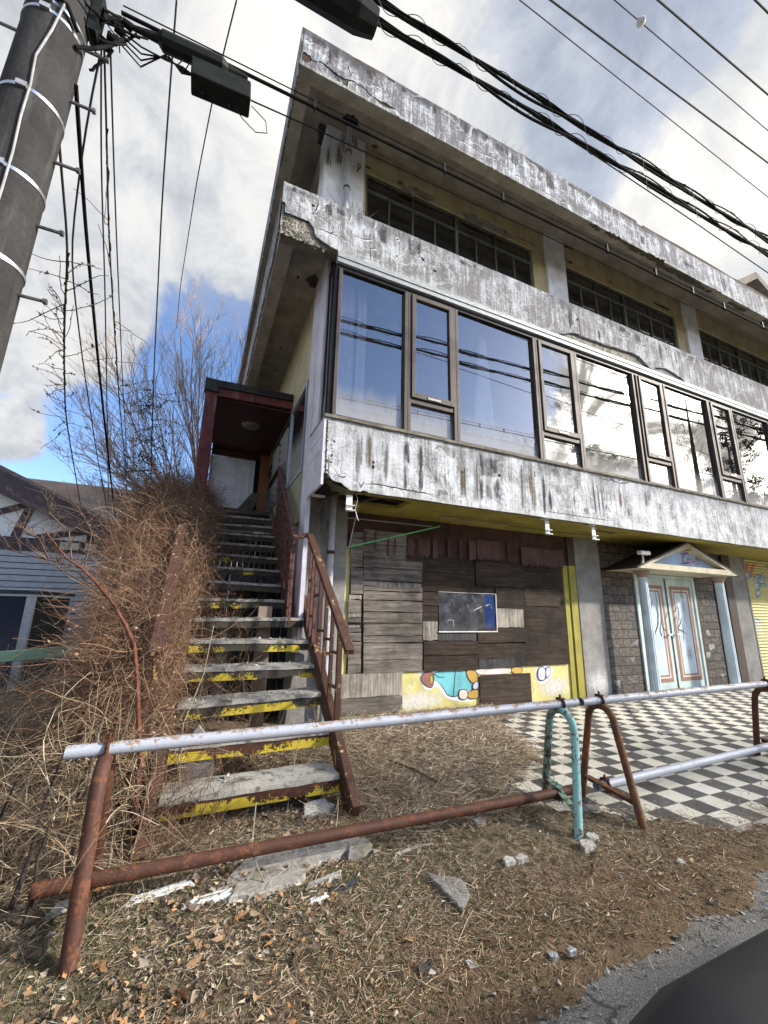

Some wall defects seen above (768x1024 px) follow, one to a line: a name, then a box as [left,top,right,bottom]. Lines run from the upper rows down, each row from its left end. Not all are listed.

crack [306,38,395,115]
damp [318,123,341,166]
spalling [280,203,336,257]
damp [356,429,381,470]
damp [404,435,423,490]
damp [461,454,500,498]
damp [521,469,559,512]